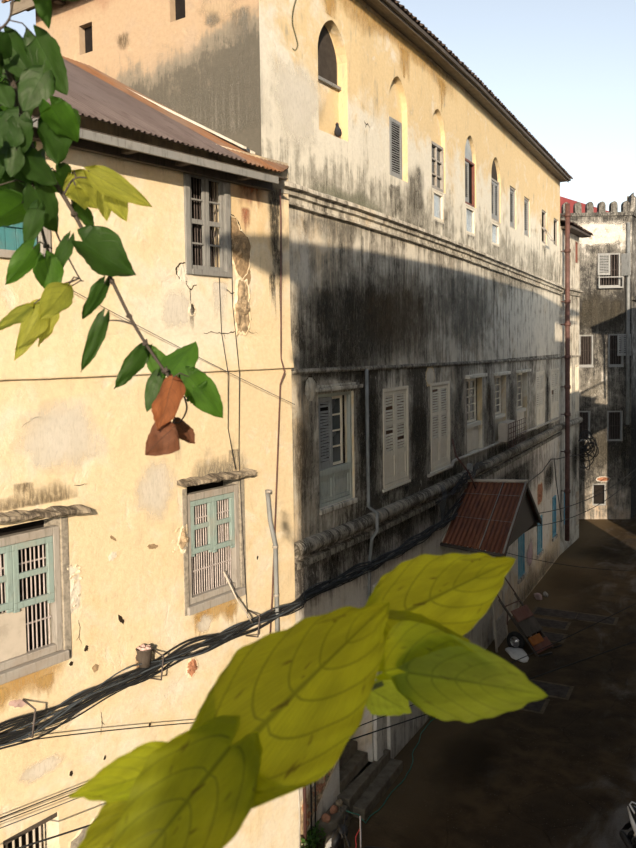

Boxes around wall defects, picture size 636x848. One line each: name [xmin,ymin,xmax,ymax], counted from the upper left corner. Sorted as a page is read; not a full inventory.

water stain [172,92,247,133]
spalling [231,215,252,281]
water stain [298,218,363,292]
water stain [579,223,626,244]
crack [175,262,196,301]
water stain [579,295,626,330]
water stain [572,425,631,478]
spalling [172,524,189,554]
peeling [67,564,82,613]
peeling [68,817,96,848]